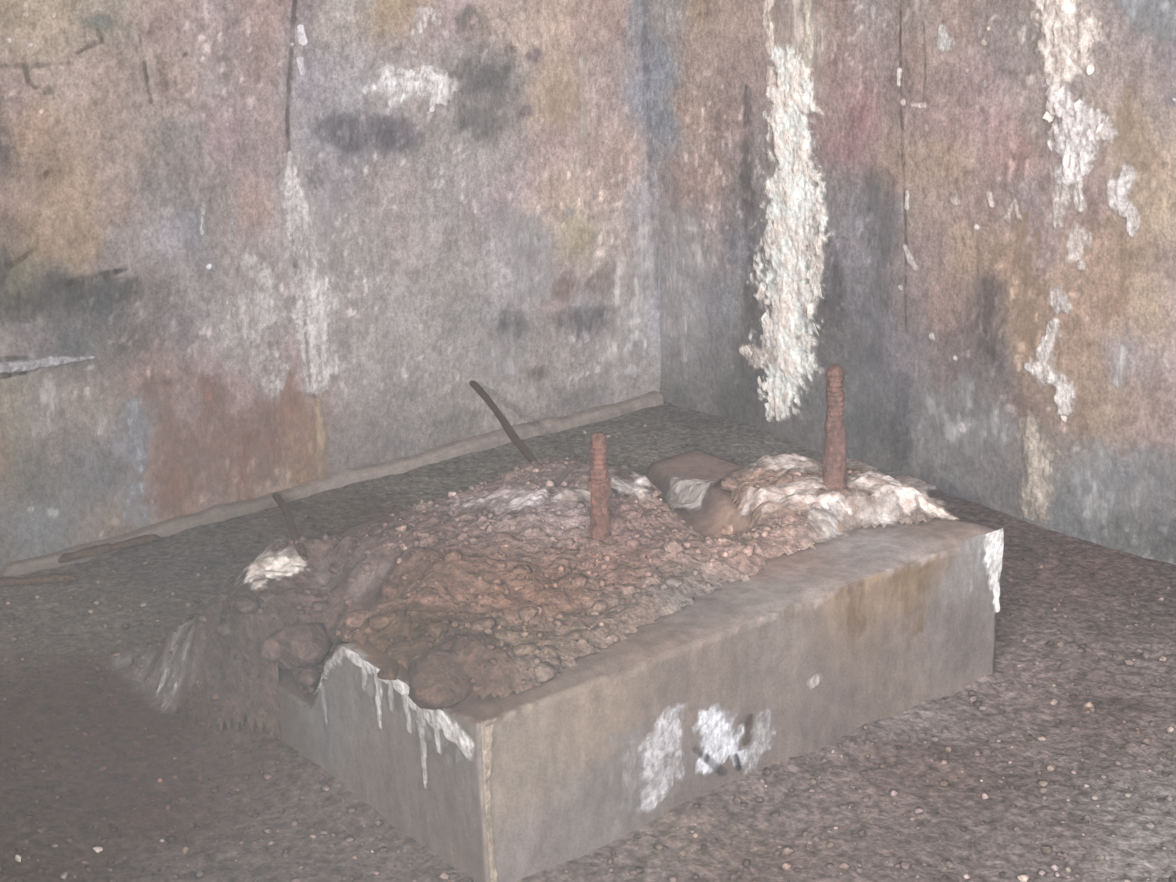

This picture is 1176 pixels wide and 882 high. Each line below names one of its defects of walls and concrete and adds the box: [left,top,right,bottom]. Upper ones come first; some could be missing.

crack [284,62,292,138]
damp [1030,0,1116,271]
damp [739,0,844,422]
damp [1105,164,1139,237]
crack [0,355,96,378]
damp [1026,288,1075,422]
damp [1113,344,1128,387]
corrosion [469,380,538,462]
damp [922,378,1059,523]
damp [317,646,498,882]
damp [618,704,776,812]